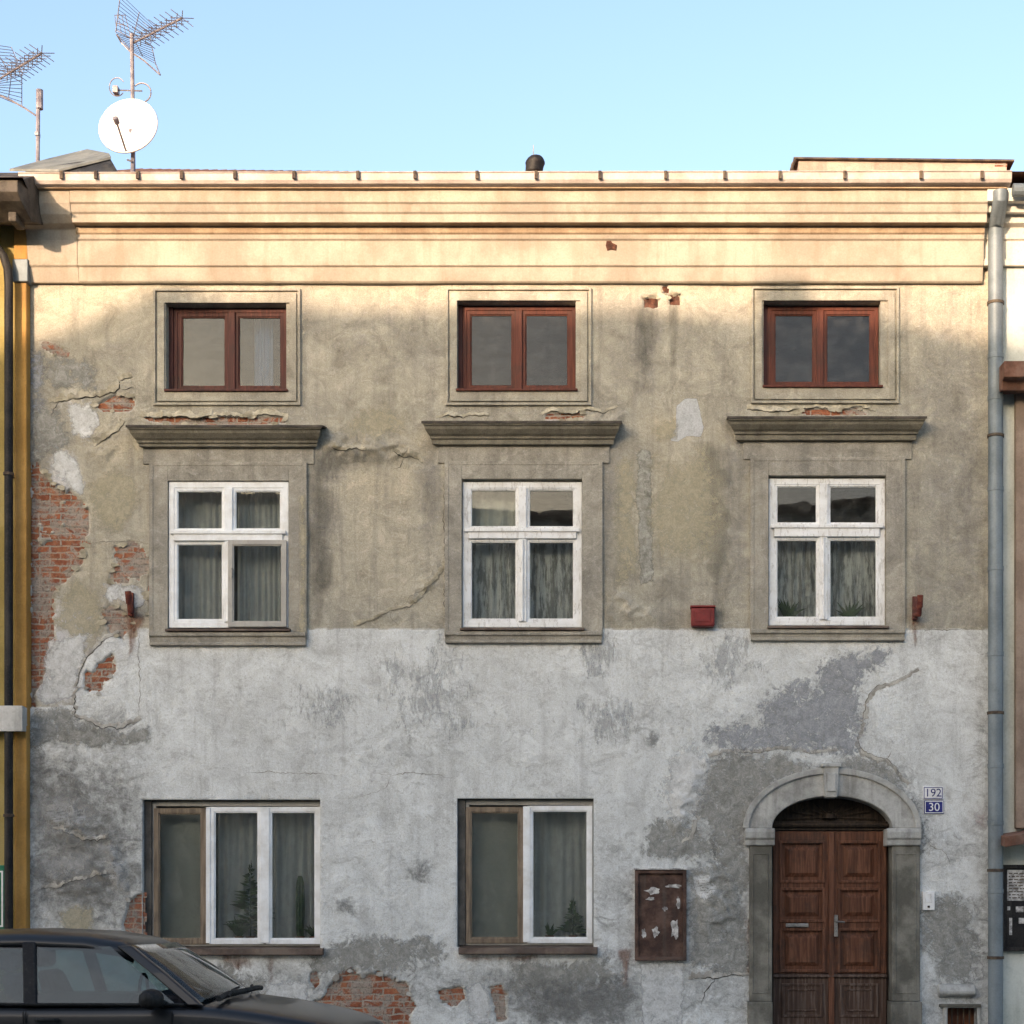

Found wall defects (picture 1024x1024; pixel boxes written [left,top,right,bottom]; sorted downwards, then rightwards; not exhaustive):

flaking render [643,286,680,309]
crack [48,372,133,415]
flaking render [545,410,586,421]
peeling [671,399,704,441]
flaking render [792,406,866,416]
flaking render [30,341,288,748]
crack [353,561,444,626]
crack [70,630,141,730]
leakage [703,647,890,756]
crack [708,667,919,786]
flaking render [218,934,447,1024]